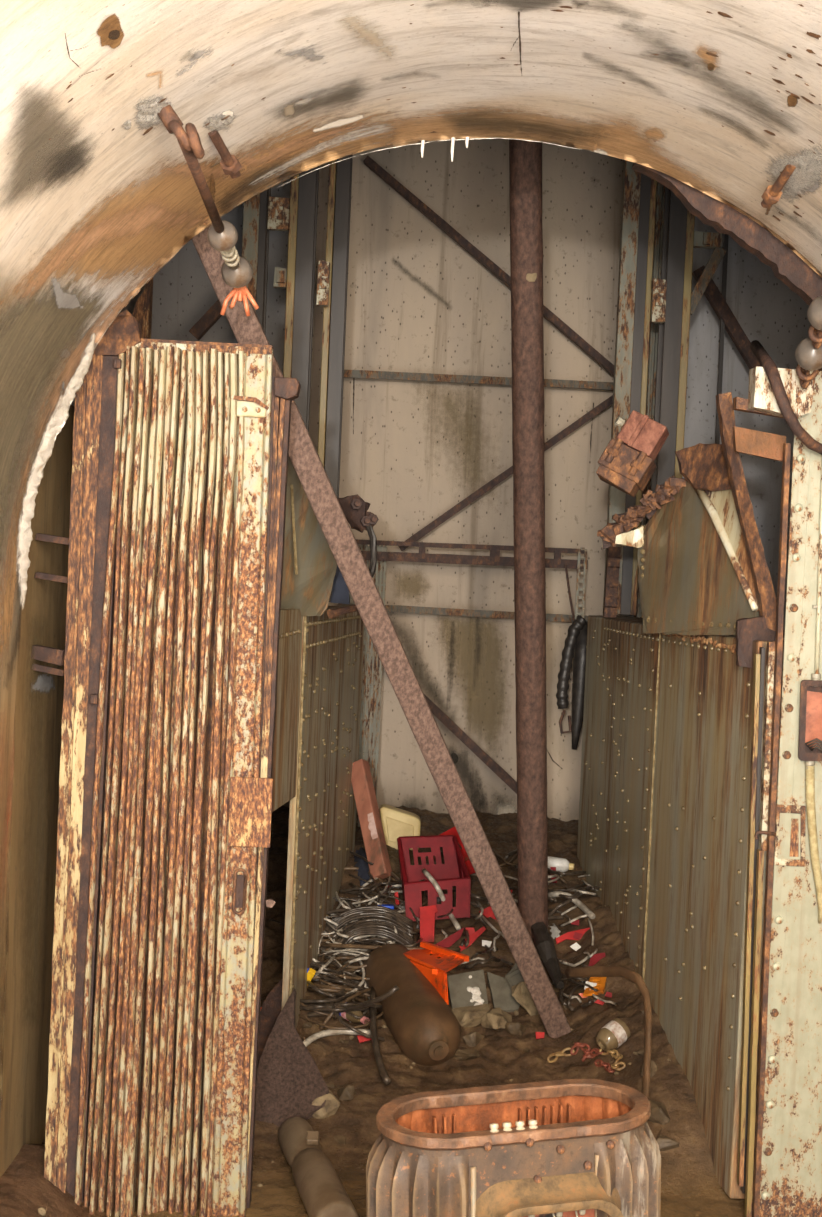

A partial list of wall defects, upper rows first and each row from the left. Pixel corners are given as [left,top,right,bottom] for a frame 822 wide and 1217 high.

spalling [123,72,171,130]
crack [511,12,522,74]
rust [772,32,822,112]
spalling [767,149,822,202]
damp [0,83,822,985]